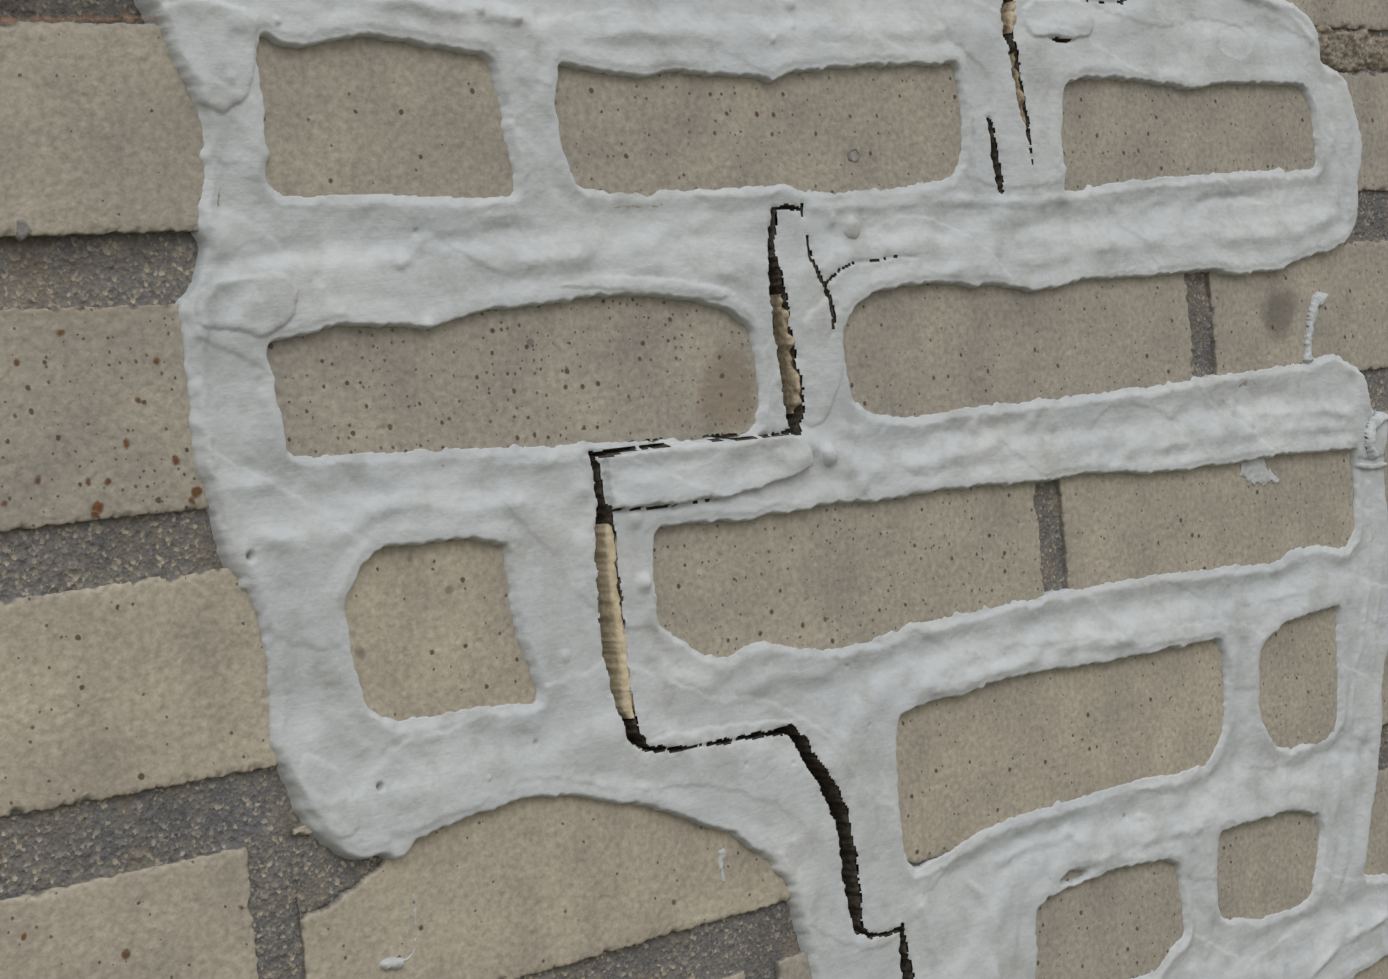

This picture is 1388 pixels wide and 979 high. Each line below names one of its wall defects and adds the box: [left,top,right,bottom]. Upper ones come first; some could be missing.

crack [986,0,1033,194]
crack [1052,36,1071,44]
crack [706,203,898,442]
crack [588,443,913,979]